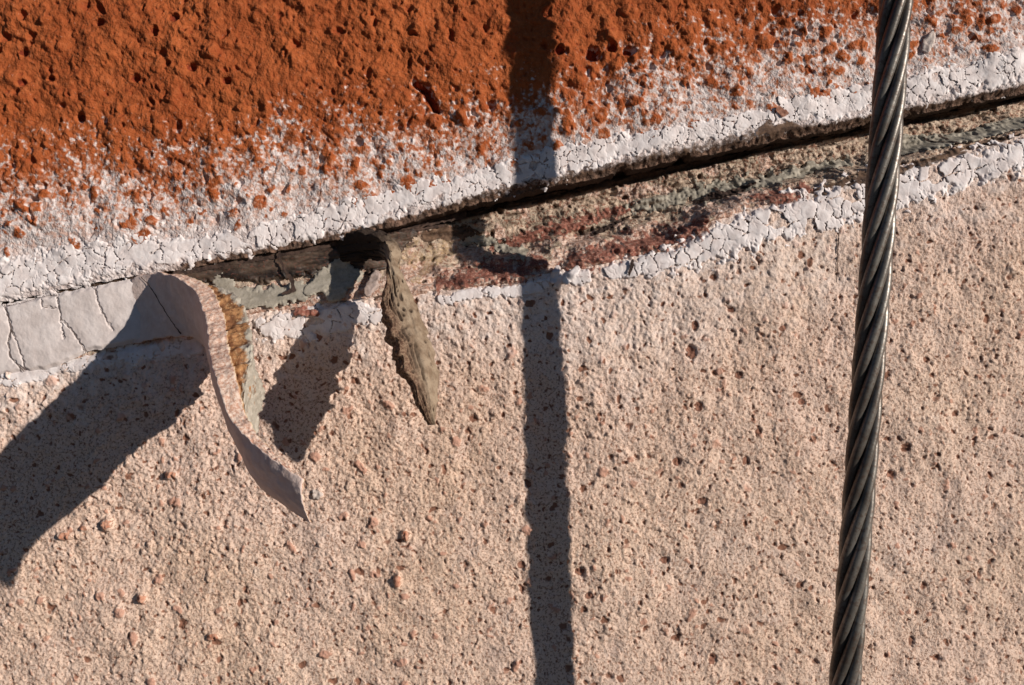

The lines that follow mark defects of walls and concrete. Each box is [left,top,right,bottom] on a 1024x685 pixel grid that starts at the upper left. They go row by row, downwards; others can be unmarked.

crack [905,46,1024,108]
crack [896,133,1024,219]
crack [0,77,873,389]
peeling [293,305,320,318]
peeling [337,227,440,425]